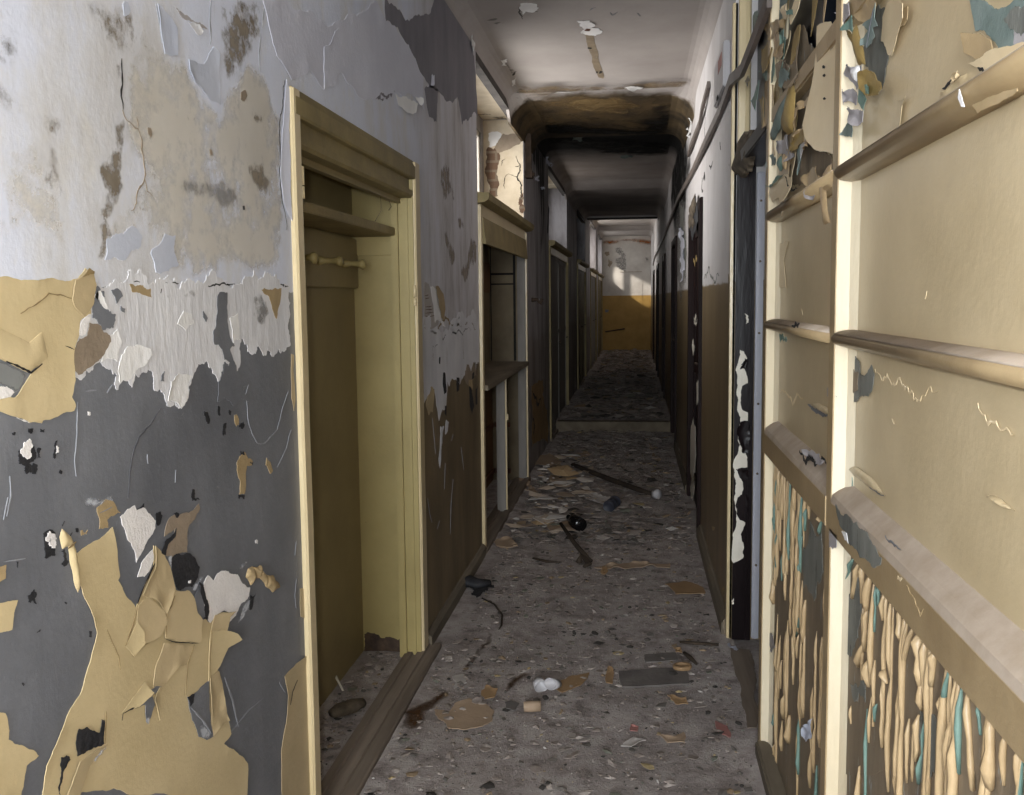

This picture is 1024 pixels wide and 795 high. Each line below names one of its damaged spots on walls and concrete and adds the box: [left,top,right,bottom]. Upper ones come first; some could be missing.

water stain [100,125,124,256]
crack [120,58,153,211]
water stain [185,184,235,205]
peeling [0,0,479,474]
water stain [249,167,268,189]
water stain [519,82,686,135]
peeling [745,0,908,225]
peeling [731,350,751,563]
crack [875,370,939,402]
crack [977,403,1014,436]
peeling [0,489,280,795]
peeling [769,466,1024,795]